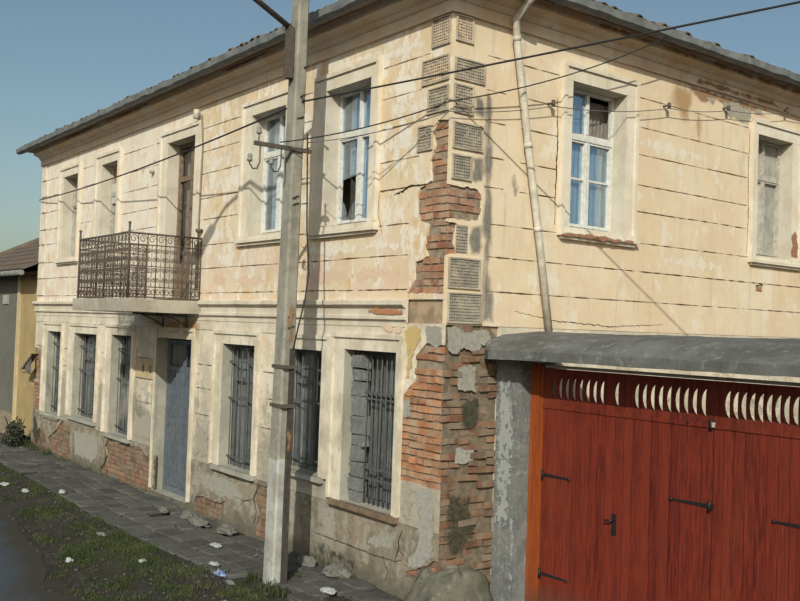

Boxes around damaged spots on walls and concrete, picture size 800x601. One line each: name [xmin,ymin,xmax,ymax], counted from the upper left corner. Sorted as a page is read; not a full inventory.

flaking render [706,97,762,124]
flaking render [300,98,481,294]
flaking render [33,377,157,491]
flaking render [195,471,244,521]
flaking render [256,441,270,539]
flaking render [368,307,498,587]
crack [311,530,404,580]